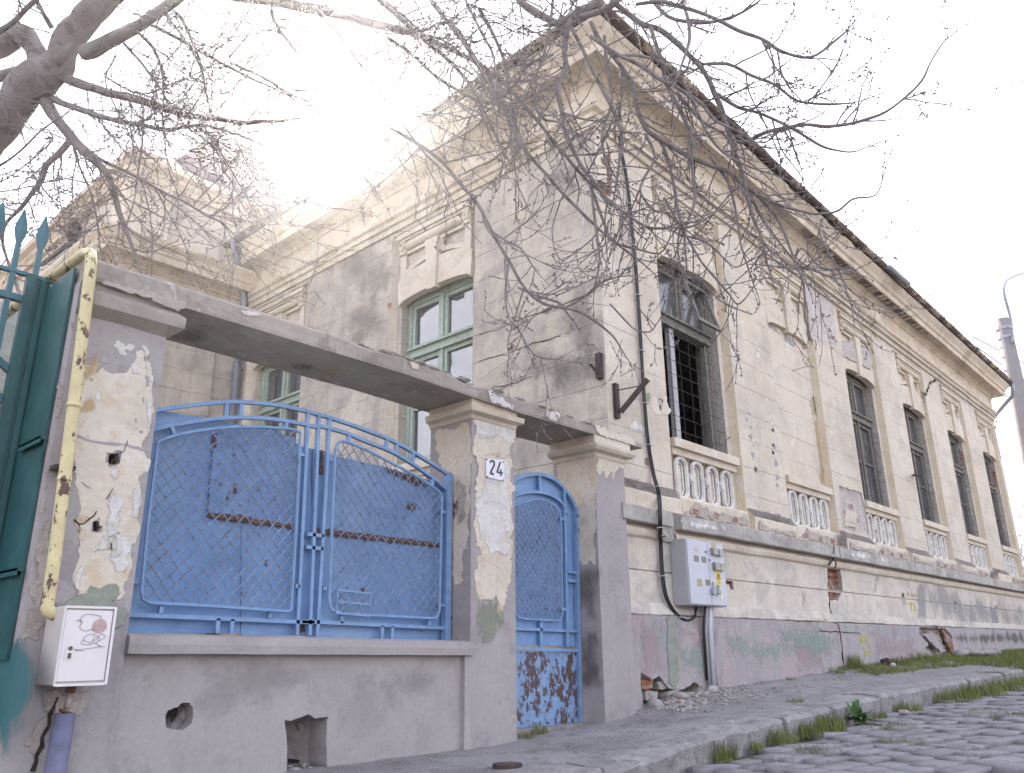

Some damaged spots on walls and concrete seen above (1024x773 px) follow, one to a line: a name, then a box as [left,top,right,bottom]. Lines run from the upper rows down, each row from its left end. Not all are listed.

flaking render [21,443,53,642]
flaking render [53,340,158,628]
peeling [434,419,516,613]
peeling [557,452,624,565]
spalling [826,567,843,601]
crack [793,599,862,668]
spalling [919,626,954,657]
crack [30,697,59,772]
spalling [165,703,193,730]
spalling [285,714,329,770]
spalling [641,673,702,702]